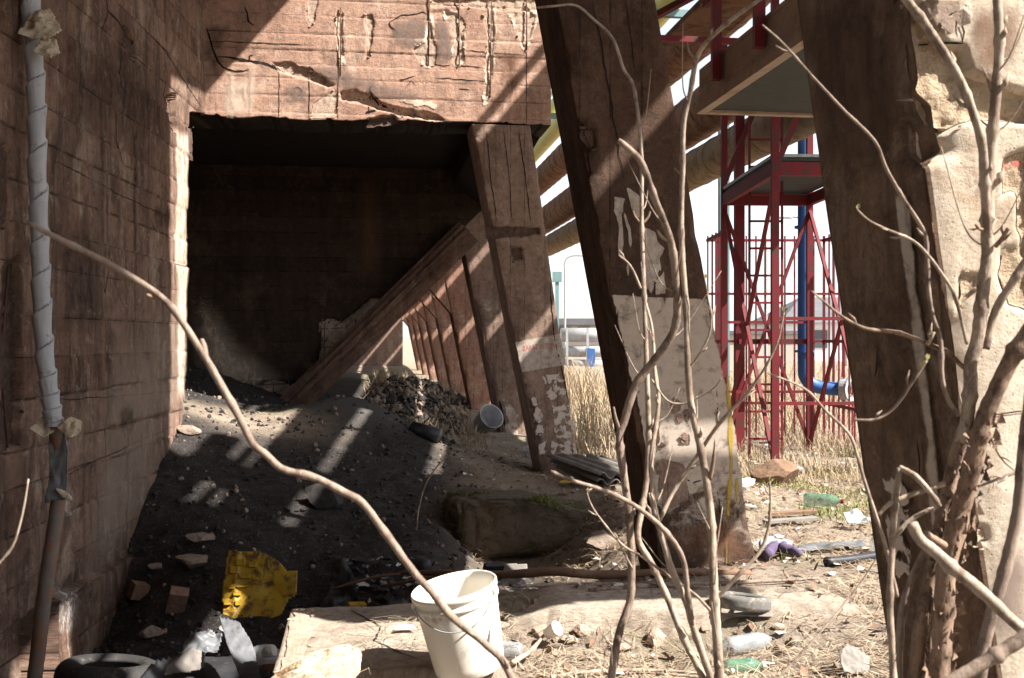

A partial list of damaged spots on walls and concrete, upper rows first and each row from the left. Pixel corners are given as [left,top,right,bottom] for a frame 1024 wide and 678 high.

spalling [276,7,442,128]
crack [206,7,531,221]
spalling [900,0,1024,131]
peeling [531,374,577,464]